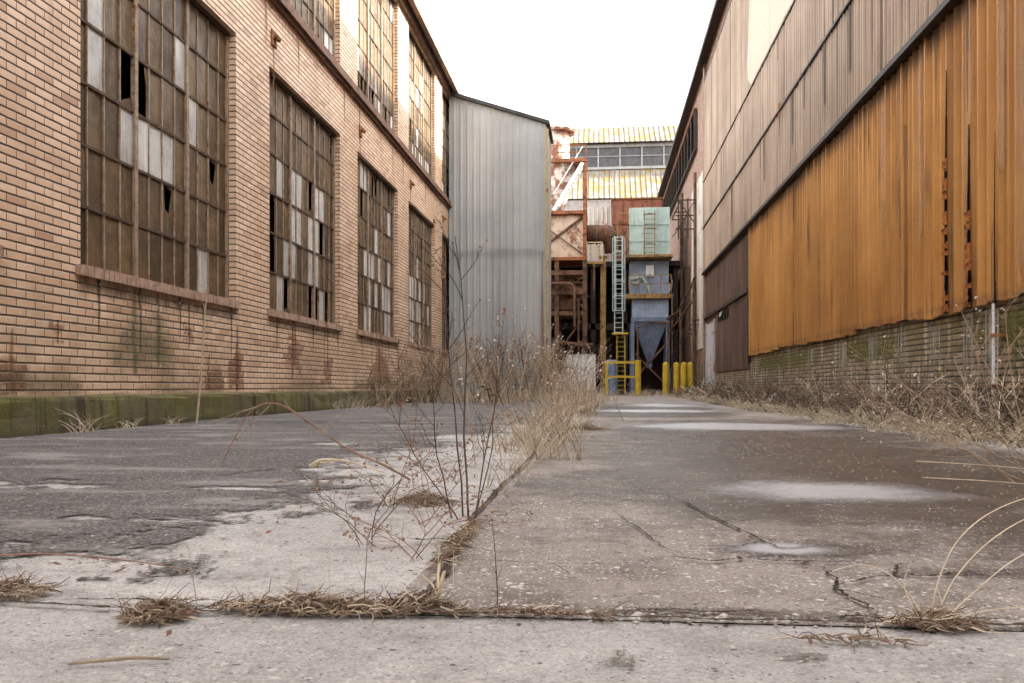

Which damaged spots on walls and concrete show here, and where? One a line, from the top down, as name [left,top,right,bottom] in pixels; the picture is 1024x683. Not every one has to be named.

crack [0,412,1024,635]